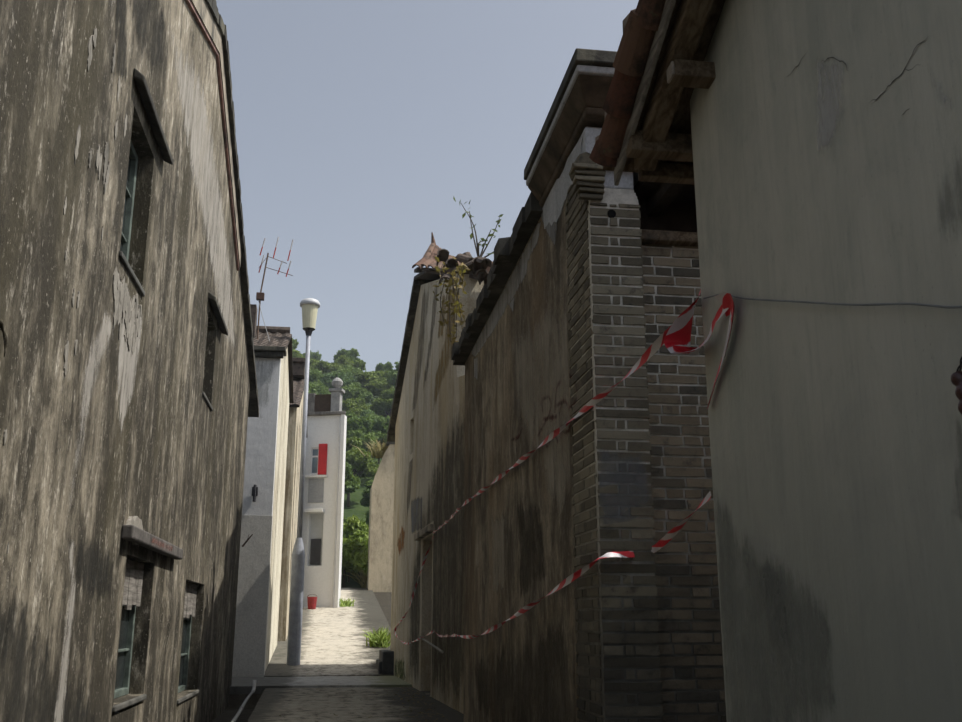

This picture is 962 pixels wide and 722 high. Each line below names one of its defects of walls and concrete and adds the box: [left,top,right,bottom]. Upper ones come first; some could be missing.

leakage [116,0,166,78]
crack [870,36,928,103]
leakage [81,313,142,442]
leakage [0,541,113,722]